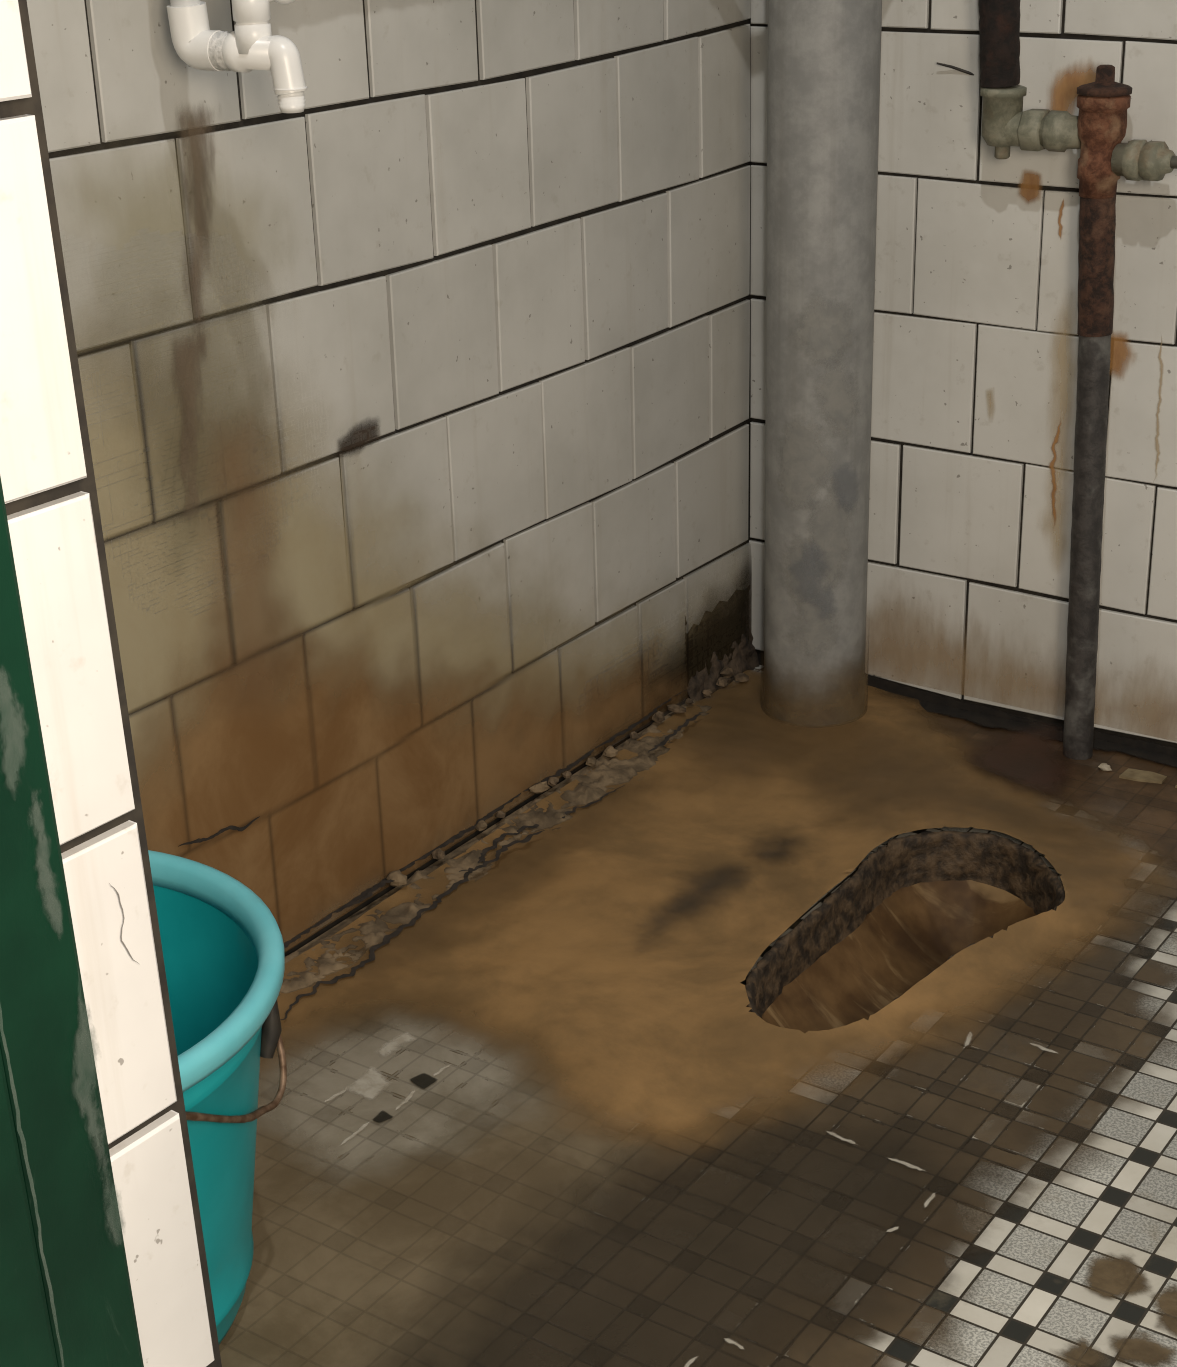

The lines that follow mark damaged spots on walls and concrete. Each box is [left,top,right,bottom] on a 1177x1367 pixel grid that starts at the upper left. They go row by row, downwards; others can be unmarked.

corrosion [1052,67,1096,112]
damp [81,113,752,953]
spalling [278,543,760,996]